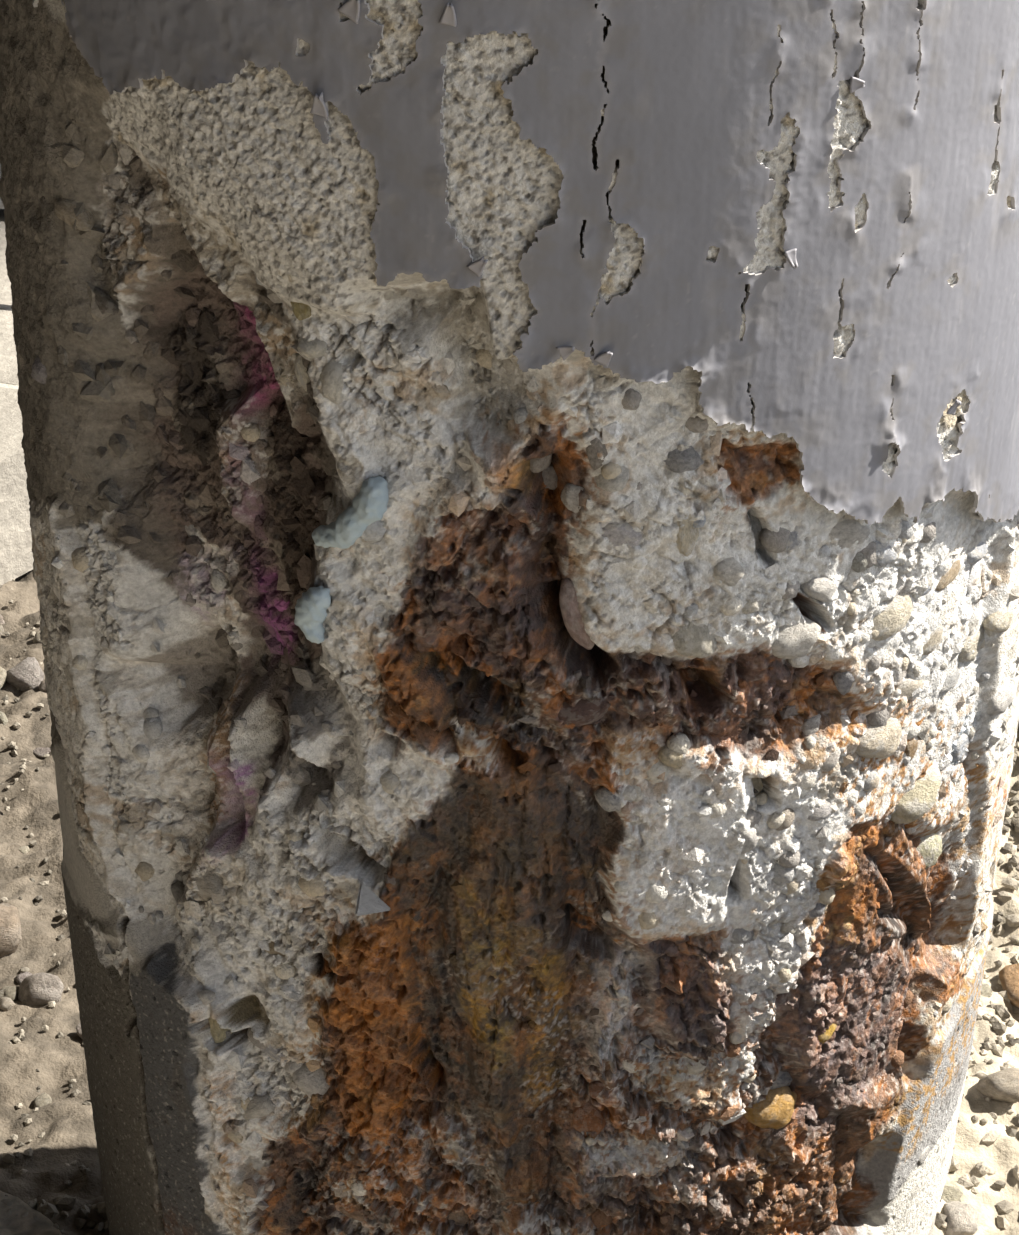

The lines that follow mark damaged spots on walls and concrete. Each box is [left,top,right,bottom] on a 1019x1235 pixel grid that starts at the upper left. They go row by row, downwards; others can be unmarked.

crack [916,0,924,51]
crack [579,4,619,256]
peeling [102,64,389,322]
peeling [441,31,563,360]
crack [739,284,748,340]
rust [718,438,801,506]
rust [376,649,456,751]
rust [801,685,897,756]
spalling [645,880,668,903]
spalling [678,844,708,870]
rust [825,811,968,1010]
crack [117,914,165,1235]